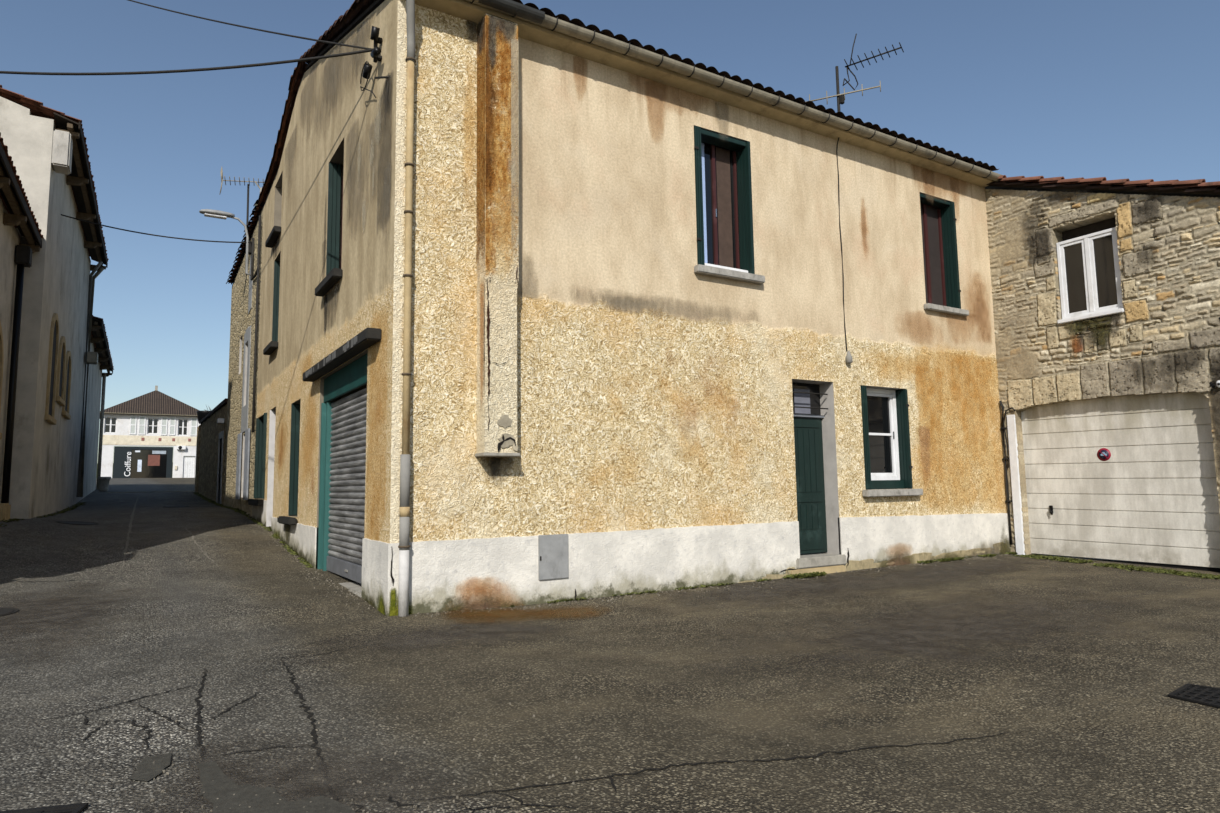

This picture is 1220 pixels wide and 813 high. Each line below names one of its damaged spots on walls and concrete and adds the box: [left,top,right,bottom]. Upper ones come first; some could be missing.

damp [358,74,389,169]
rust [477,19,519,211]
damp [1168,349,1220,462]
crack [44,643,383,801]
crack [404,730,1032,808]